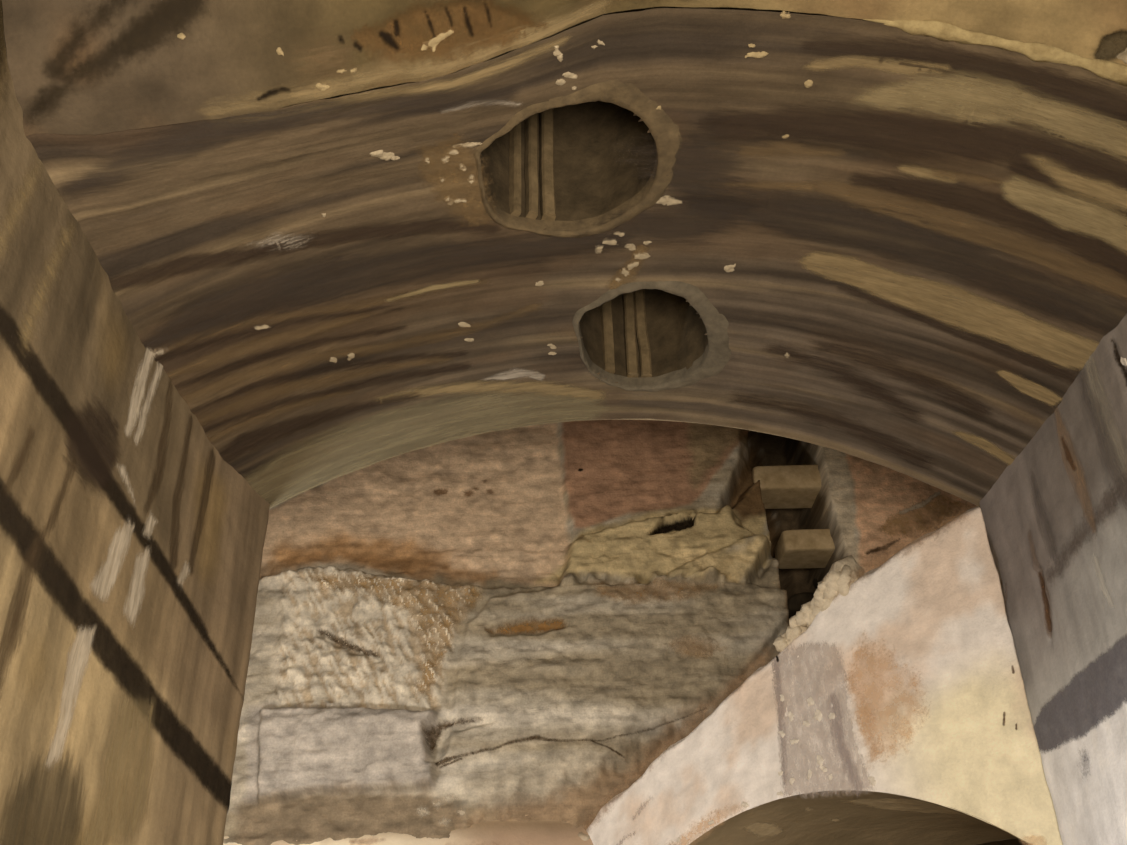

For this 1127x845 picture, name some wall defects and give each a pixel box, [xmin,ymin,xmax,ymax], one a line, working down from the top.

water stain [48,0,125,75]
flaking render [209,1,607,121]
spalling [1095,31,1127,64]
peeling [370,150,400,161]
water stain [66,39,1127,444]
peeling [595,231,652,290]
crack [1111,340,1127,384]
water stain [736,395,931,468]
water stain [801,251,1127,550]
water stain [0,229,605,845]
spalling [773,493,961,652]
crack [424,718,674,768]